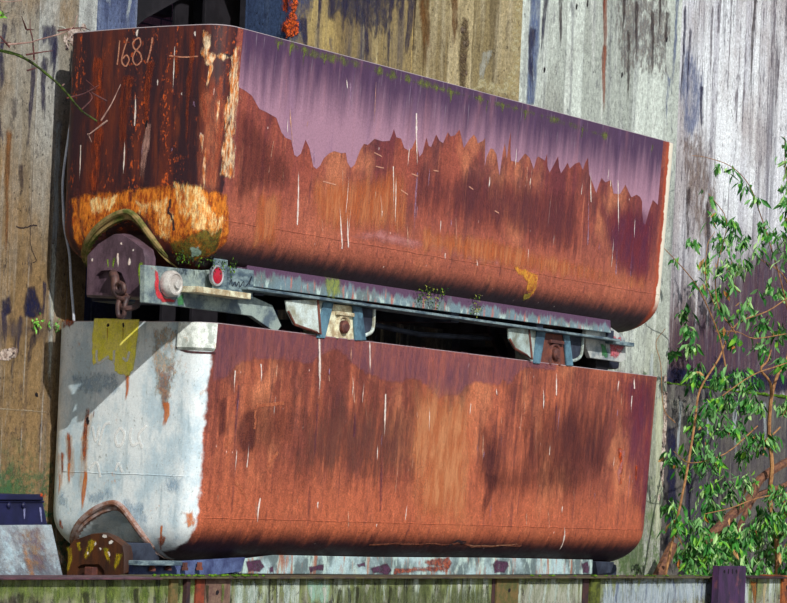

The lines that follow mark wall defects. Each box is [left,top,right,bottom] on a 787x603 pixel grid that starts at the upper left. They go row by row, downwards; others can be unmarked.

rust [282,0,302,38]
damp [289,0,414,61]
damp [745,0,787,74]
damp [28,25,58,143]
damp [616,0,715,258]
damp [235,582,262,603]
damp [281,582,296,603]
damp [309,583,370,603]
damp [383,584,489,603]